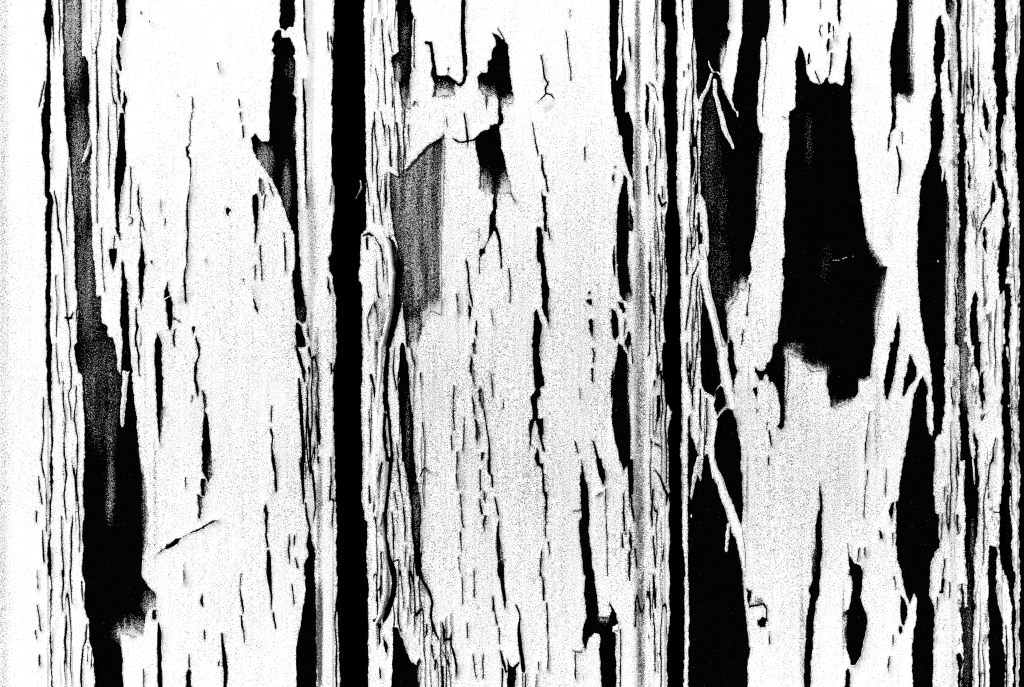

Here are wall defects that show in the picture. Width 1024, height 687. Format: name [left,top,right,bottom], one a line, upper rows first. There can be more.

peeling [62,0,156,687]
crack [143,347,339,687]
peeling [251,0,310,383]
crack [333,597,341,687]
crack [425,0,467,97]
peeling [386,0,515,687]
crack [451,10,572,687]
peeling [609,0,635,470]
peeling [687,0,770,687]
peeling [753,36,887,429]
peeling [879,0,1008,687]